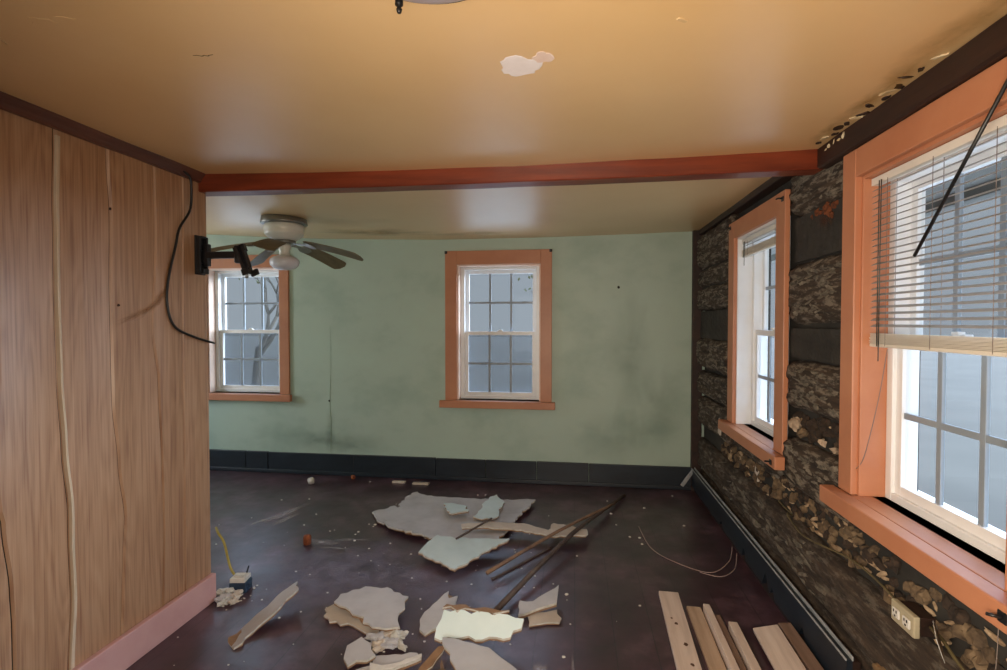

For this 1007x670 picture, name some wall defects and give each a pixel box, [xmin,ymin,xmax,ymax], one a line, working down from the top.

peeling [500,51,555,77]
peeling [784,444,838,505]
peeling [701,451,826,596]